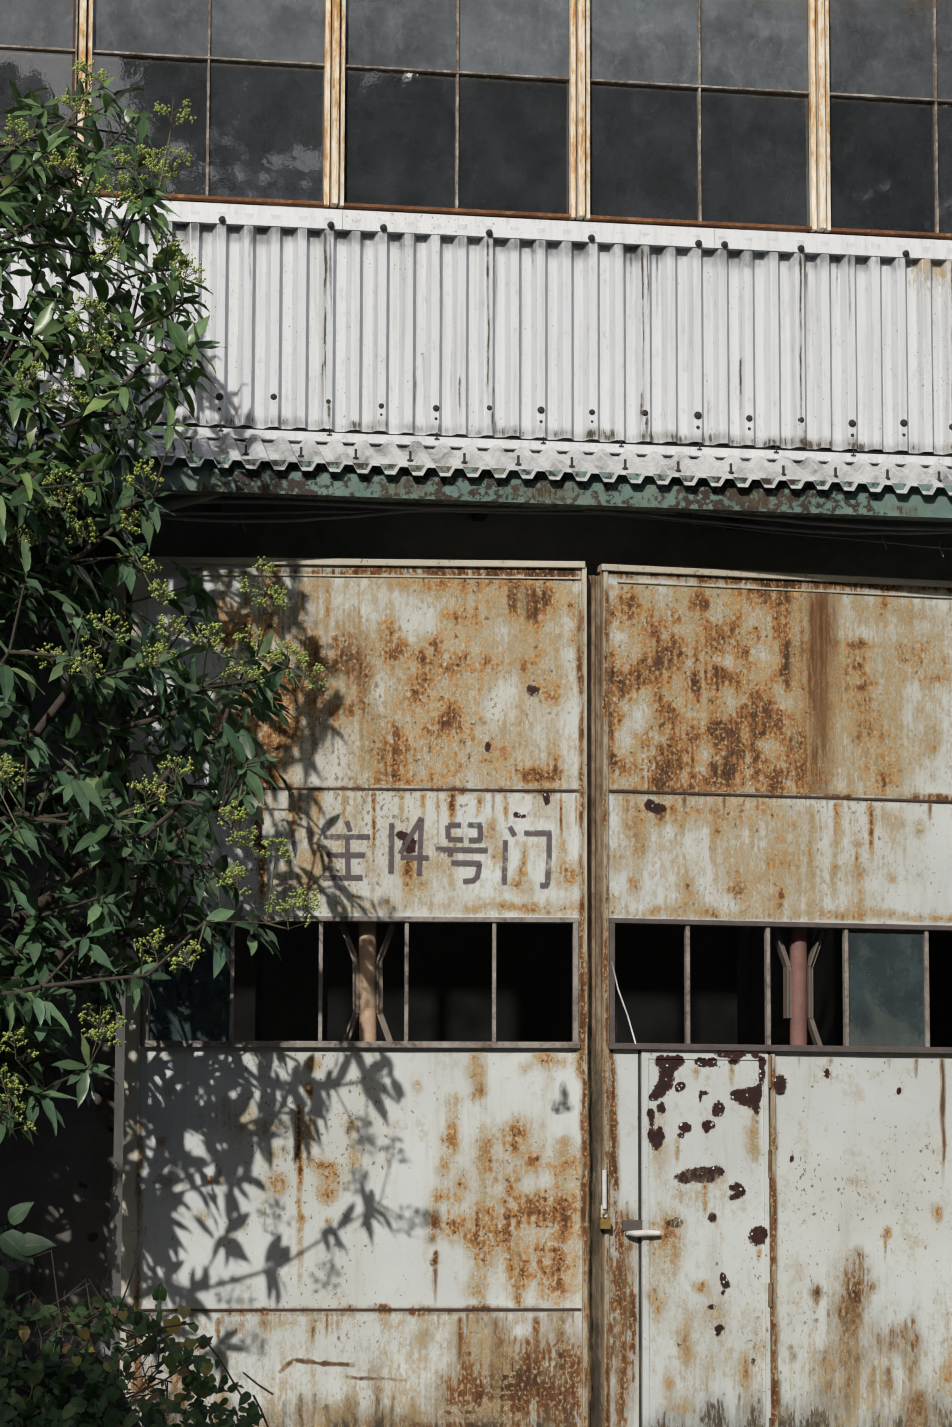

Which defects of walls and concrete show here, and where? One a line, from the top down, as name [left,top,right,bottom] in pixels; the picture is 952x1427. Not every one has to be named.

rust [205,557,952,1427]
peeling [647,1051,787,1150]
peeling [673,1165,746,1200]
rust [134,1121,164,1309]
peeling [667,1217,684,1228]
peeling [748,1225,768,1246]
rust [178,1305,353,1340]
peeling [707,1272,731,1336]
rust [131,1335,193,1427]